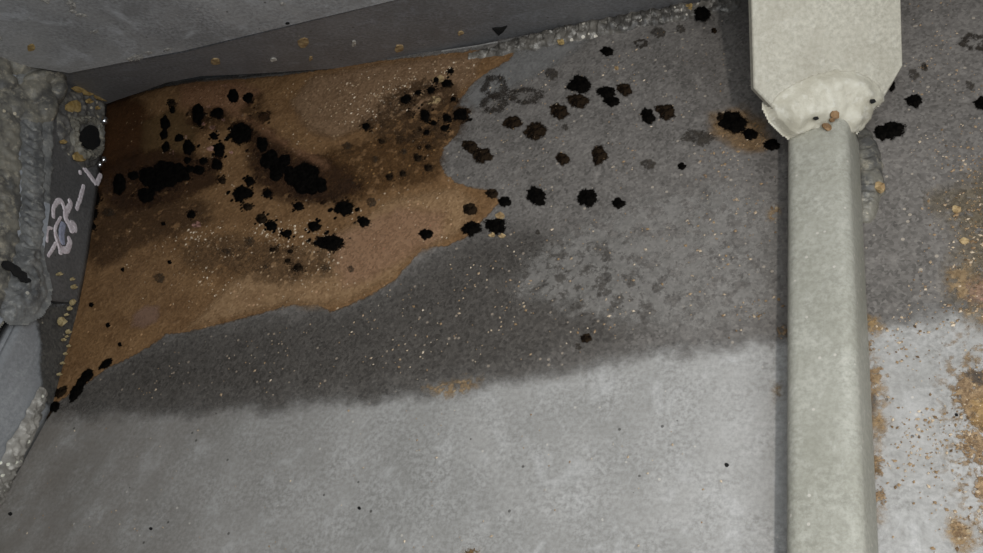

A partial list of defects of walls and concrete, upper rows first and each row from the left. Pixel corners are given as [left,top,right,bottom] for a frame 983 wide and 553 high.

damp [45,0,788,421]
damp [863,0,983,325]
corrosion [939,183,983,329]
corrosion [945,345,983,552]